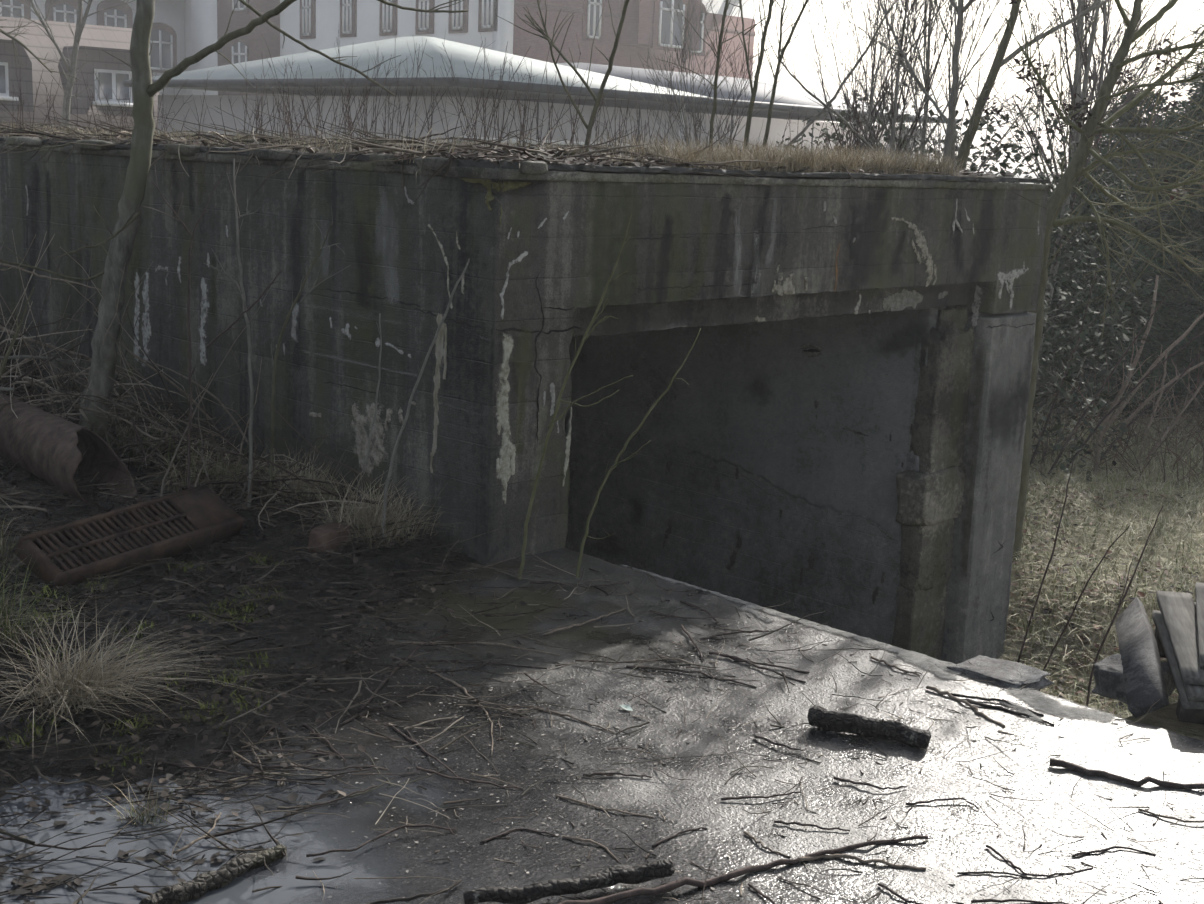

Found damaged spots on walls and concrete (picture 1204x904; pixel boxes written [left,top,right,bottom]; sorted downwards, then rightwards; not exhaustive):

spalling [882,217,948,311]
peeling [998,262,1025,309]
crack [319,224,580,443]
spalling [349,401,417,477]
spalling [998,687,1114,722]